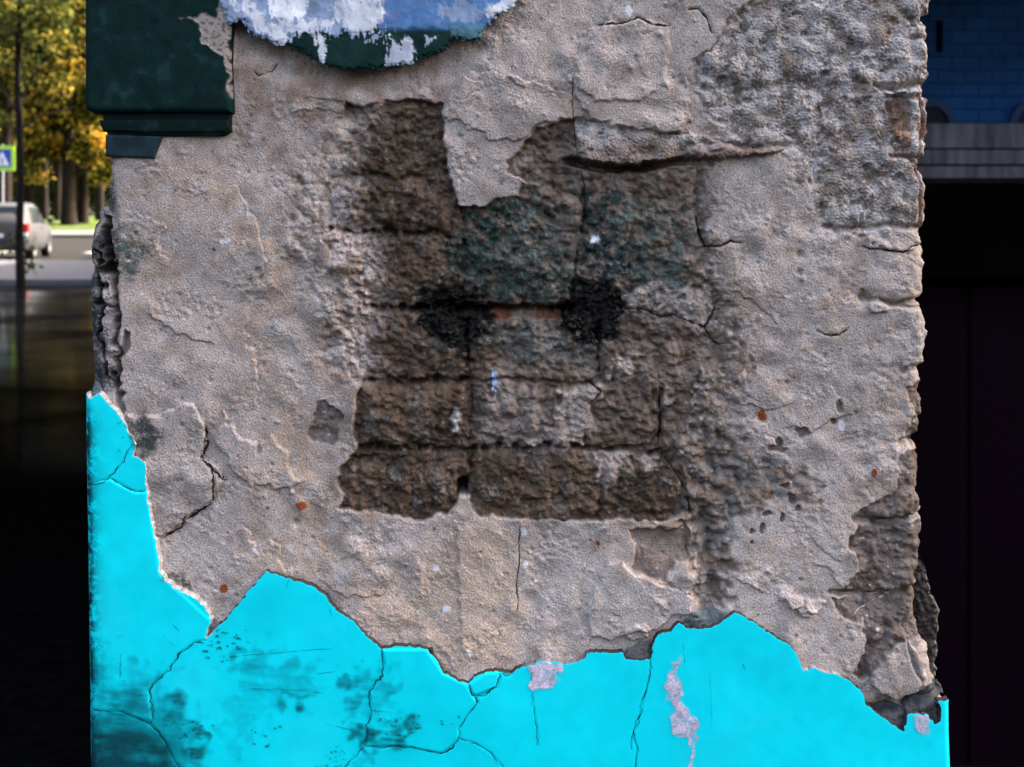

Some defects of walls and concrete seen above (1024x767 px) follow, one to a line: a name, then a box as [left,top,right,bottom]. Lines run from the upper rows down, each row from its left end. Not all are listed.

crack [695,214,742,248]
water stain [474,318,607,367]
spalling [307,0,930,609]
crack [164,427,226,538]
spalling [87,380,948,731]
crack [514,528,522,611]
water stain [352,715,414,748]